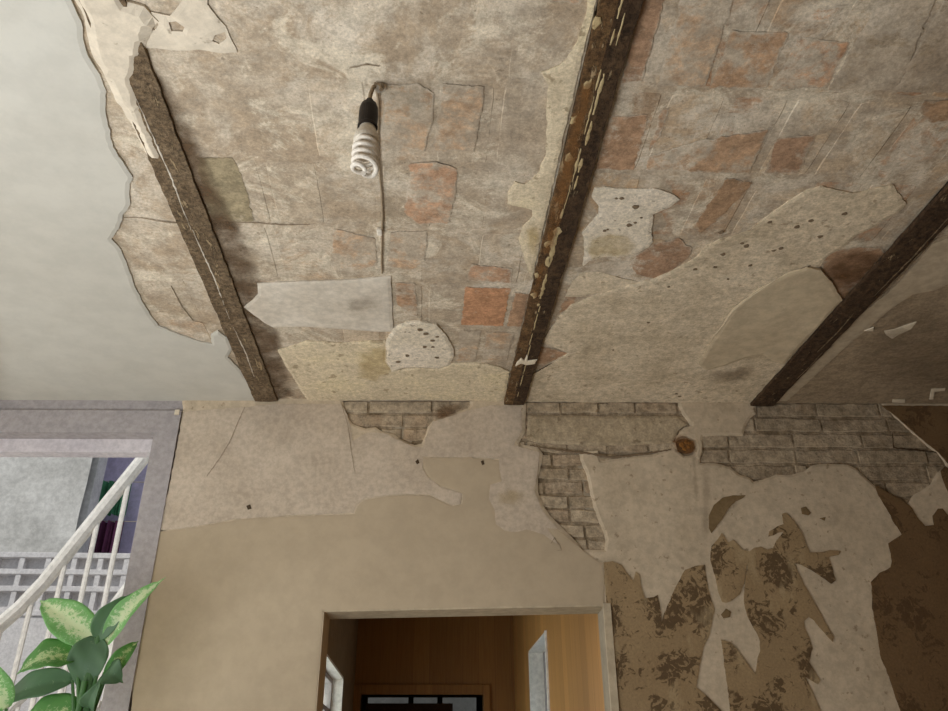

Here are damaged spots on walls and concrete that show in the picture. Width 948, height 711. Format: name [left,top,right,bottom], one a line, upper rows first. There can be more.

peeling [0,0,254,401]
spalling [147,0,602,383]
spalling [515,0,948,403]
peeling [131,218,948,711]